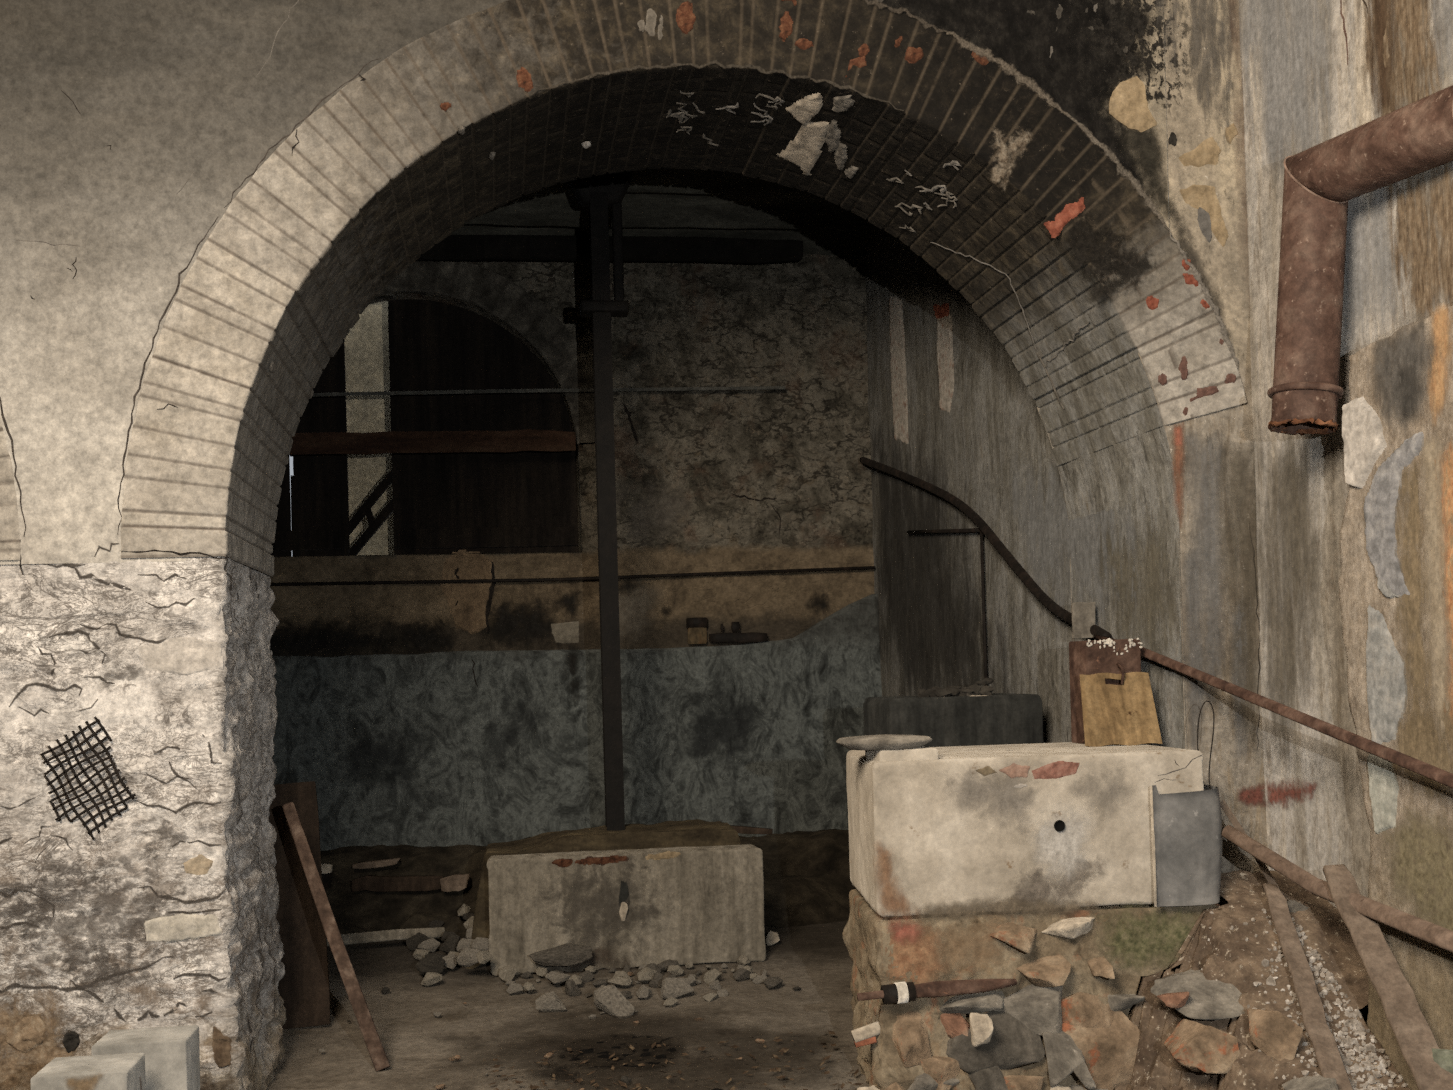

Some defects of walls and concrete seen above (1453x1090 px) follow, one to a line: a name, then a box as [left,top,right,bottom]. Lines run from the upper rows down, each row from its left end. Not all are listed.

spalling [637,1,696,40]
peeling [516,44,904,179]
corrosion [1365,0,1440,116]
peeling [864,0,1239,416]
leakage [1125,128,1220,323]
corrosion [1389,163,1453,418]
flaking render [889,295,909,444]
corrosion [1393,441,1453,797]
crack [0,797,72,929]
crack [137,734,263,872]
corrosion [1239,781,1316,806]
crack [0,886,275,1061]